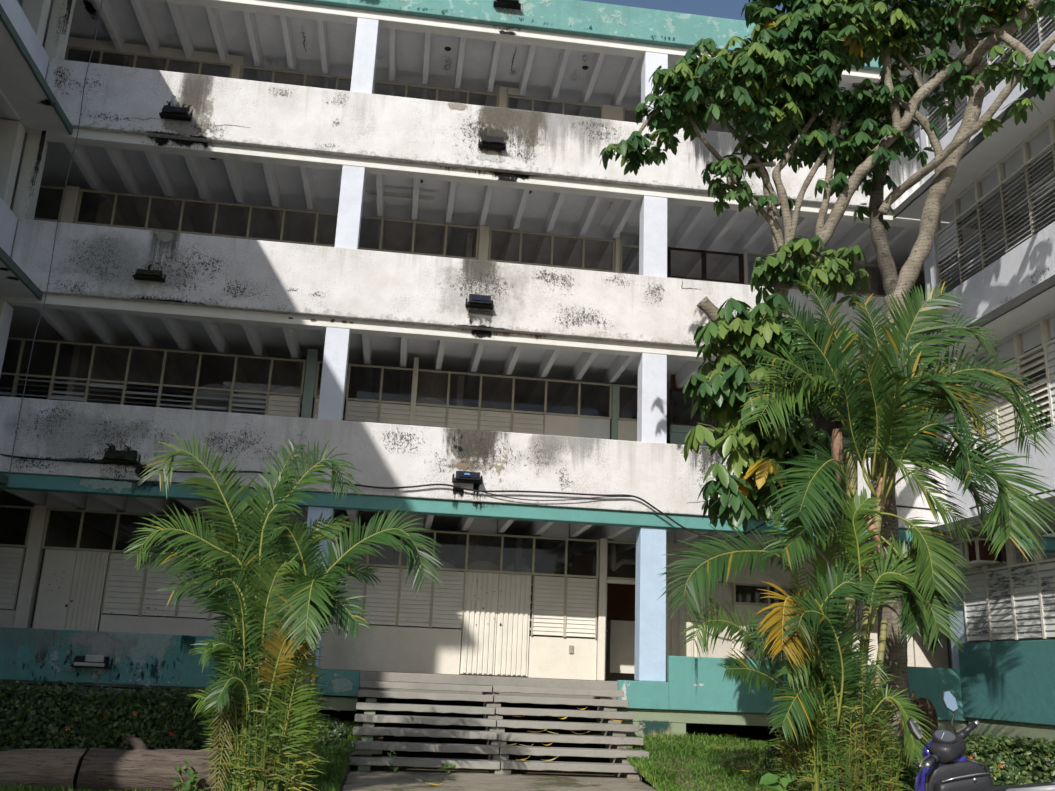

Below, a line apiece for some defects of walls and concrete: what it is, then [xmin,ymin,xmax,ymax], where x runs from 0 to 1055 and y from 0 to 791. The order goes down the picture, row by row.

leakage [57,228,275,306]
leakage [534,267,611,331]
leakage [11,402,332,493]
leakage [379,429,427,457]
peeling [6,631,185,688]